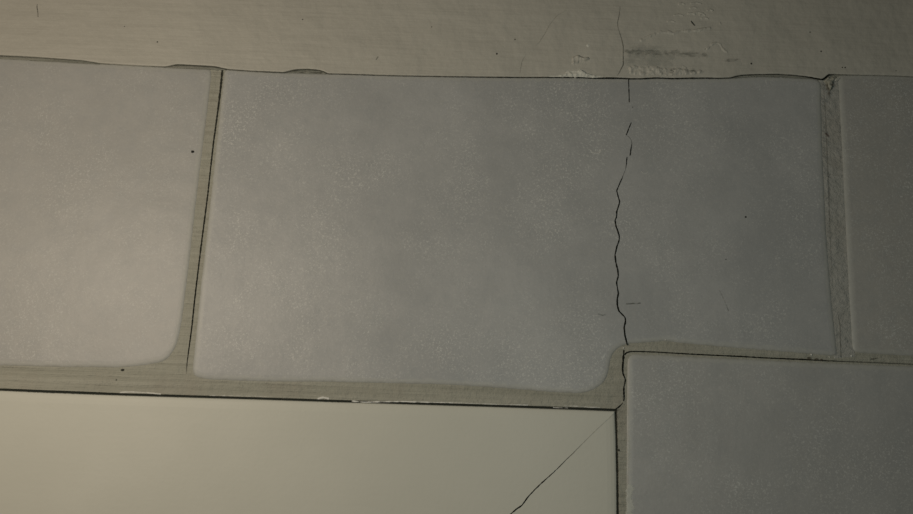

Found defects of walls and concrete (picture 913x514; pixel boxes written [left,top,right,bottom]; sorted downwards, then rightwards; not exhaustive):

crack [0,56,100,64]
crack [0,123,845,514]
crack [159,44,843,365]